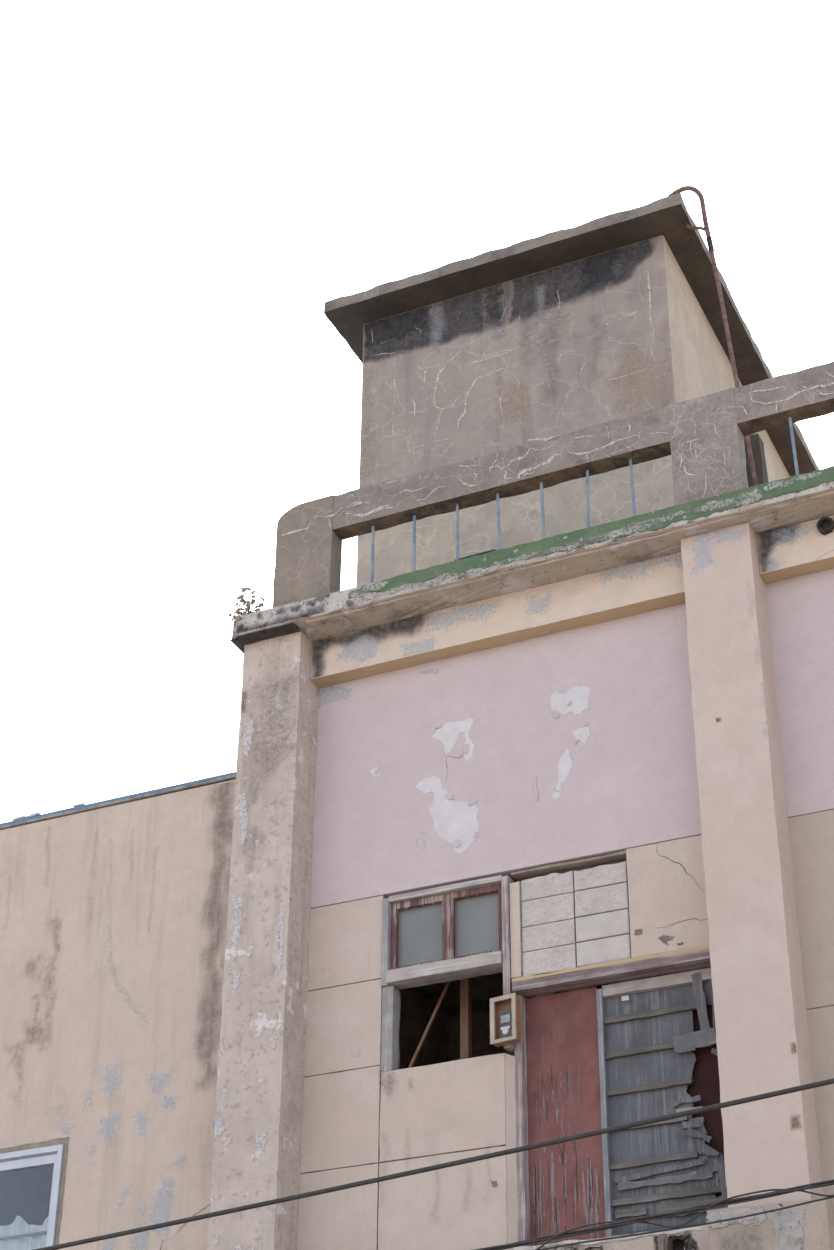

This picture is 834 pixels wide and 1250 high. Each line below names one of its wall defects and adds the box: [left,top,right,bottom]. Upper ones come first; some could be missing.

water stain [364,239,652,360]
crack [282,271,834,552]
water stain [759,526,796,571]
peeling [431,718,475,761]
peeling [533,686,592,801]
peeling [415,775,480,854]
peeling [533,1069,600,1250]
spalling [673,1239,685,1250]
flaking render [706,1205,805,1250]